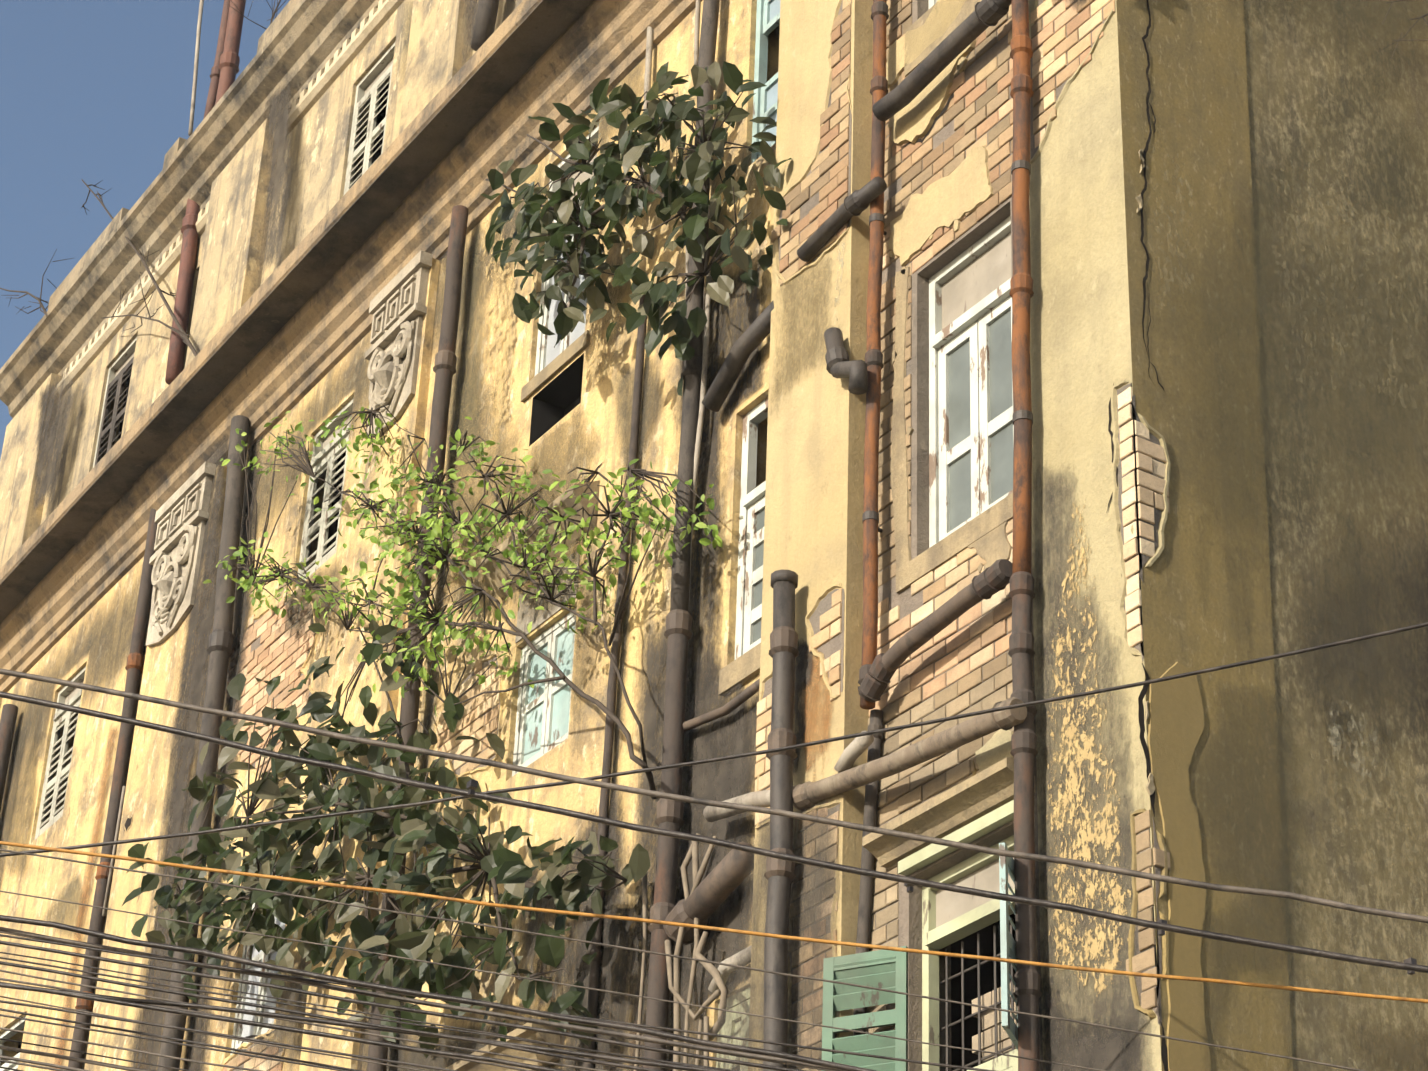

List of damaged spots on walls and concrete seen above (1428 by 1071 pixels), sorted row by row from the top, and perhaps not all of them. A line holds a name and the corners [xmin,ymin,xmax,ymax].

flaking render [771,0,852,286]
peeling [886,0,967,89]
peeling [888,38,977,146]
flaking render [1029,0,1115,164]
crack [1135,0,1165,392]
damp [34,372,74,509]
flaking render [805,582,845,702]
damp [1035,478,1146,1071]
peeling [1042,501,1171,1027]
flaking render [1111,379,1171,662]